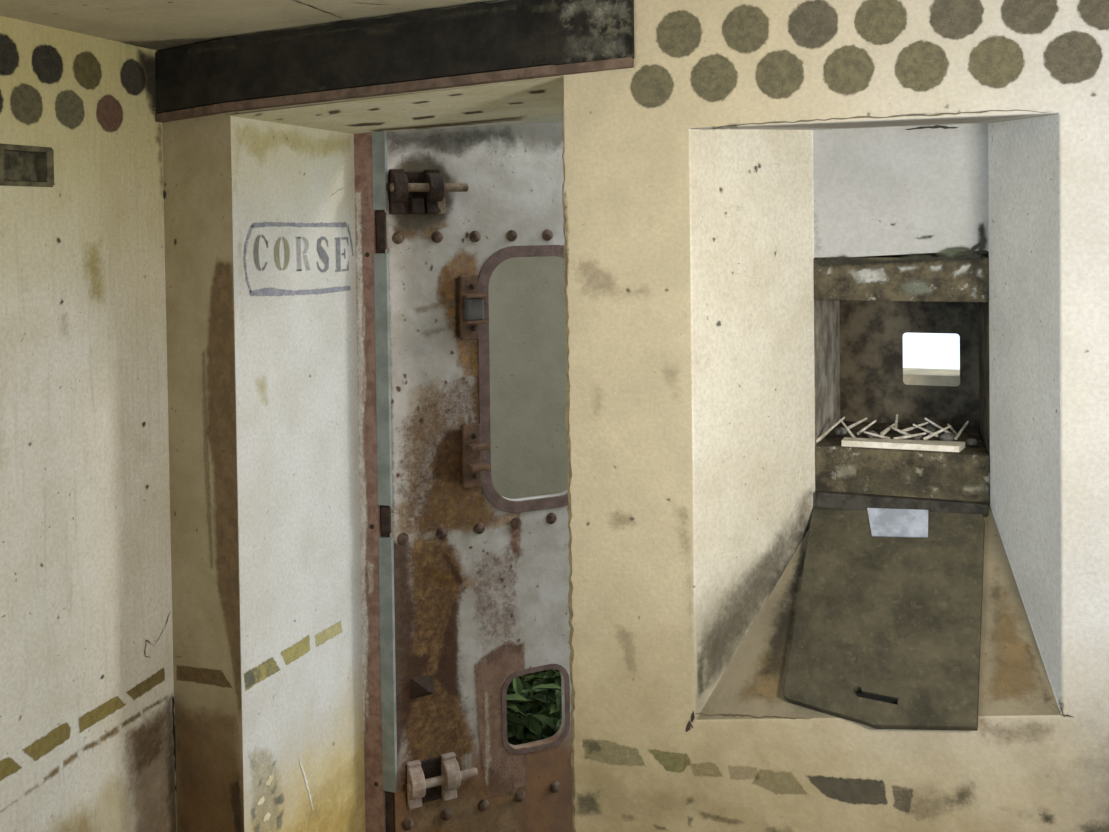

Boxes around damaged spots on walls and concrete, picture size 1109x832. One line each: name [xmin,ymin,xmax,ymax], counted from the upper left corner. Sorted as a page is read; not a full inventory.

corrosion [391,233,527,832]
leakage [698,514,809,696]